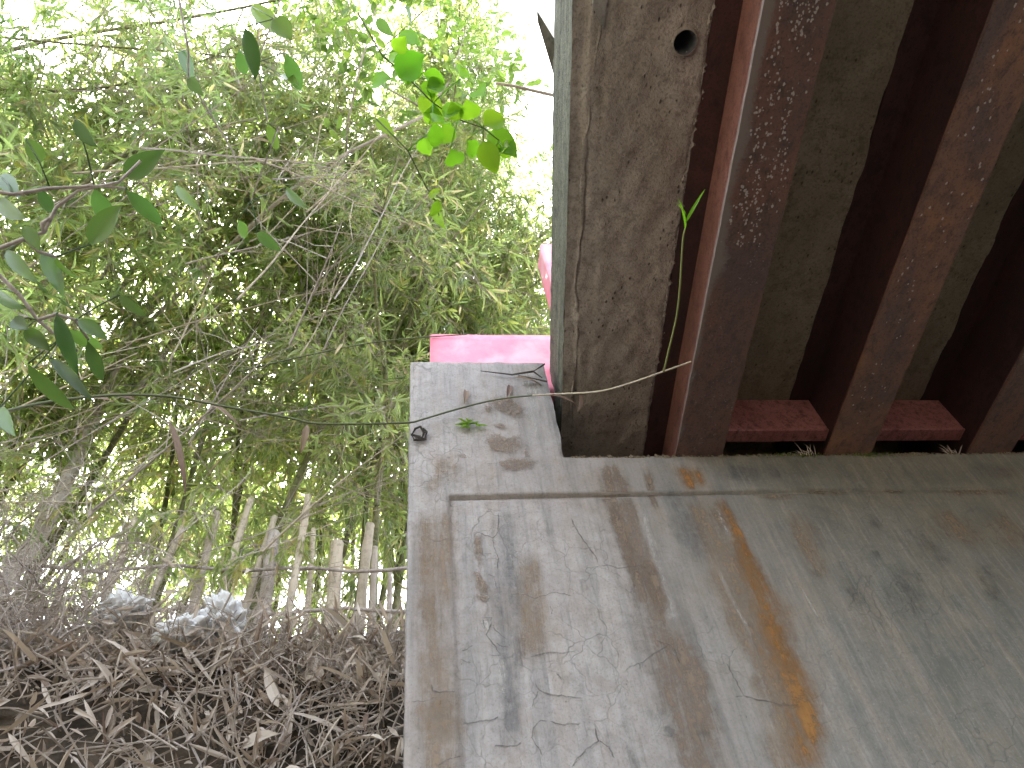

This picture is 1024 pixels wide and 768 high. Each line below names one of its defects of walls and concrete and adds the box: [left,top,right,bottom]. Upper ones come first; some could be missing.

corrosion [603,466,715,768]
corrosion [723,505,822,765]